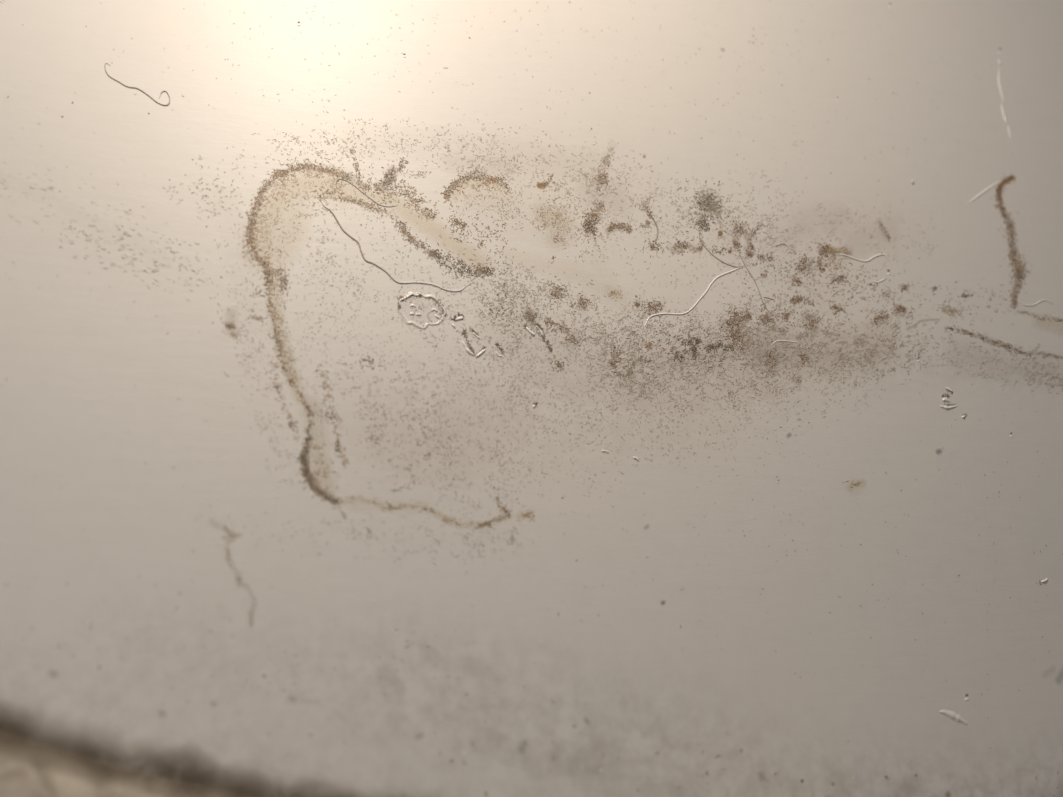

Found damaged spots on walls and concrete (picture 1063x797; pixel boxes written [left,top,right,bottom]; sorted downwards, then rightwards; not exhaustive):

water stain [59,88,1063,579]
water stain [0,721,262,797]